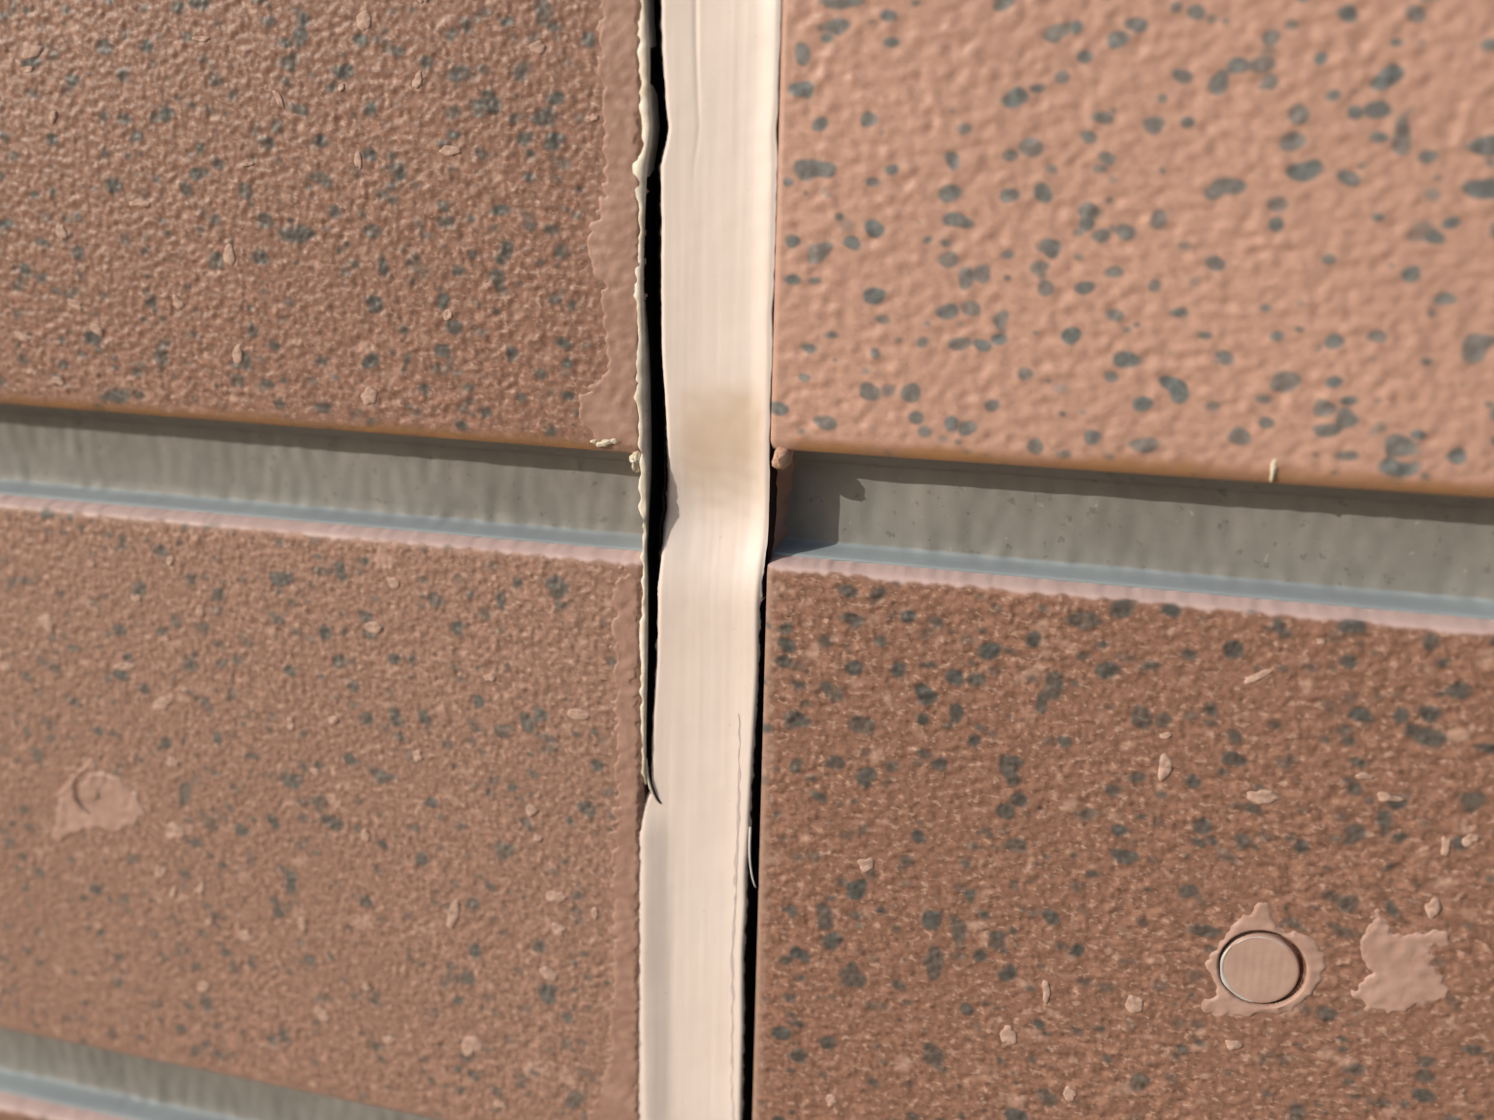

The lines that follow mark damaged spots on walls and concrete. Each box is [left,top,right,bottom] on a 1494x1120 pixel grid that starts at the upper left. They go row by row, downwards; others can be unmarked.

crack [632,0,668,804]
crack [742,379,778,1120]
crack [772,23,782,334]